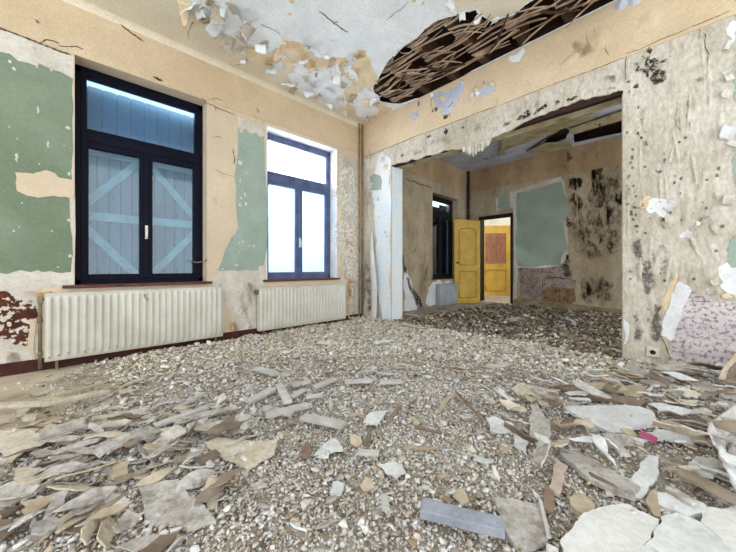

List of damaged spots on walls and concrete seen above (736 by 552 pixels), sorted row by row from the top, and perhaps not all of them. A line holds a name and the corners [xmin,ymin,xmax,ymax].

peeling [445,0,530,26]
crack [0,27,84,55]
peeling [85,0,424,149]
peeling [509,48,525,62]
water stain [636,47,671,85]
peeling [430,80,504,115]
water stain [565,168,666,294]
spalling [402,255,451,311]
water stain [518,254,612,304]
peeling [0,291,38,360]
water stain [647,305,661,341]